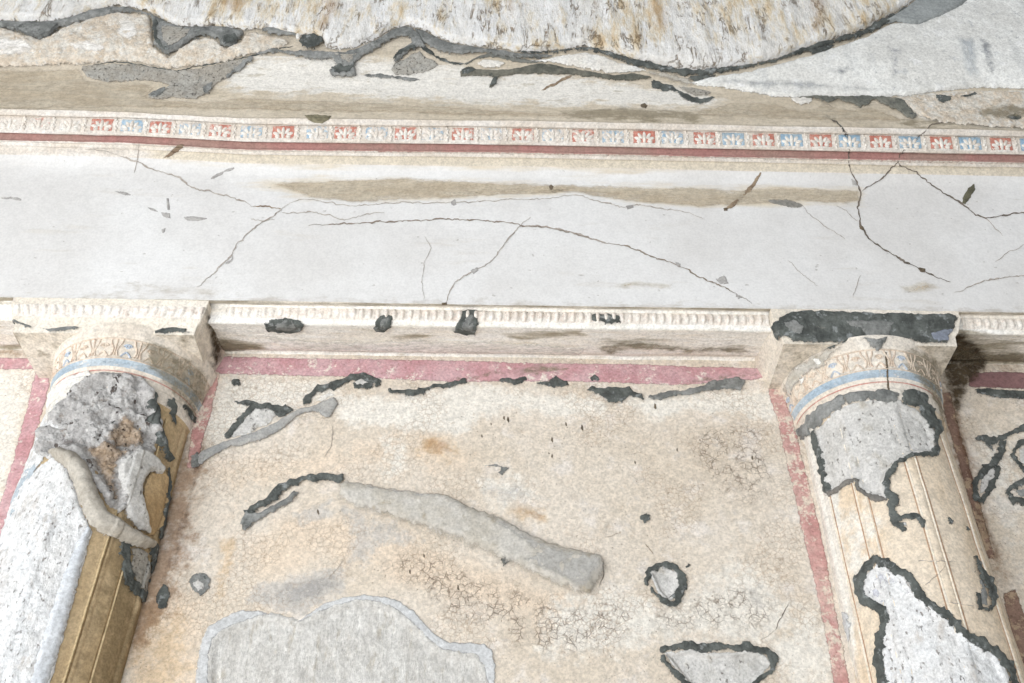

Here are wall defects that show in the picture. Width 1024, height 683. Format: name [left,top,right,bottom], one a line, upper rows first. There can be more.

flaking render [0,0,914,104]
flaking render [901,90,1024,129]
crack [86,147,750,315]
crack [802,103,1024,293]
peeling [231,408,277,437]
flaking render [796,389,944,532]
flaking render [0,371,169,683]
flaking render [195,595,496,683]
crack [403,560,625,646]
flaking render [643,561,690,607]
flaking render [659,640,779,683]
flaking render [853,554,1019,683]